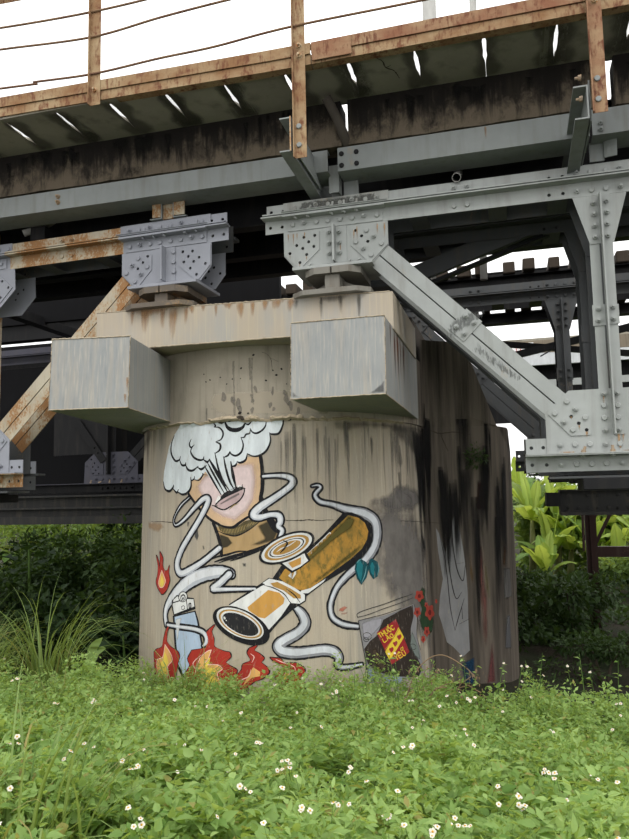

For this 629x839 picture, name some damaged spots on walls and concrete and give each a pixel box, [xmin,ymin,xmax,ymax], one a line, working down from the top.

leakage [290,408,507,635]